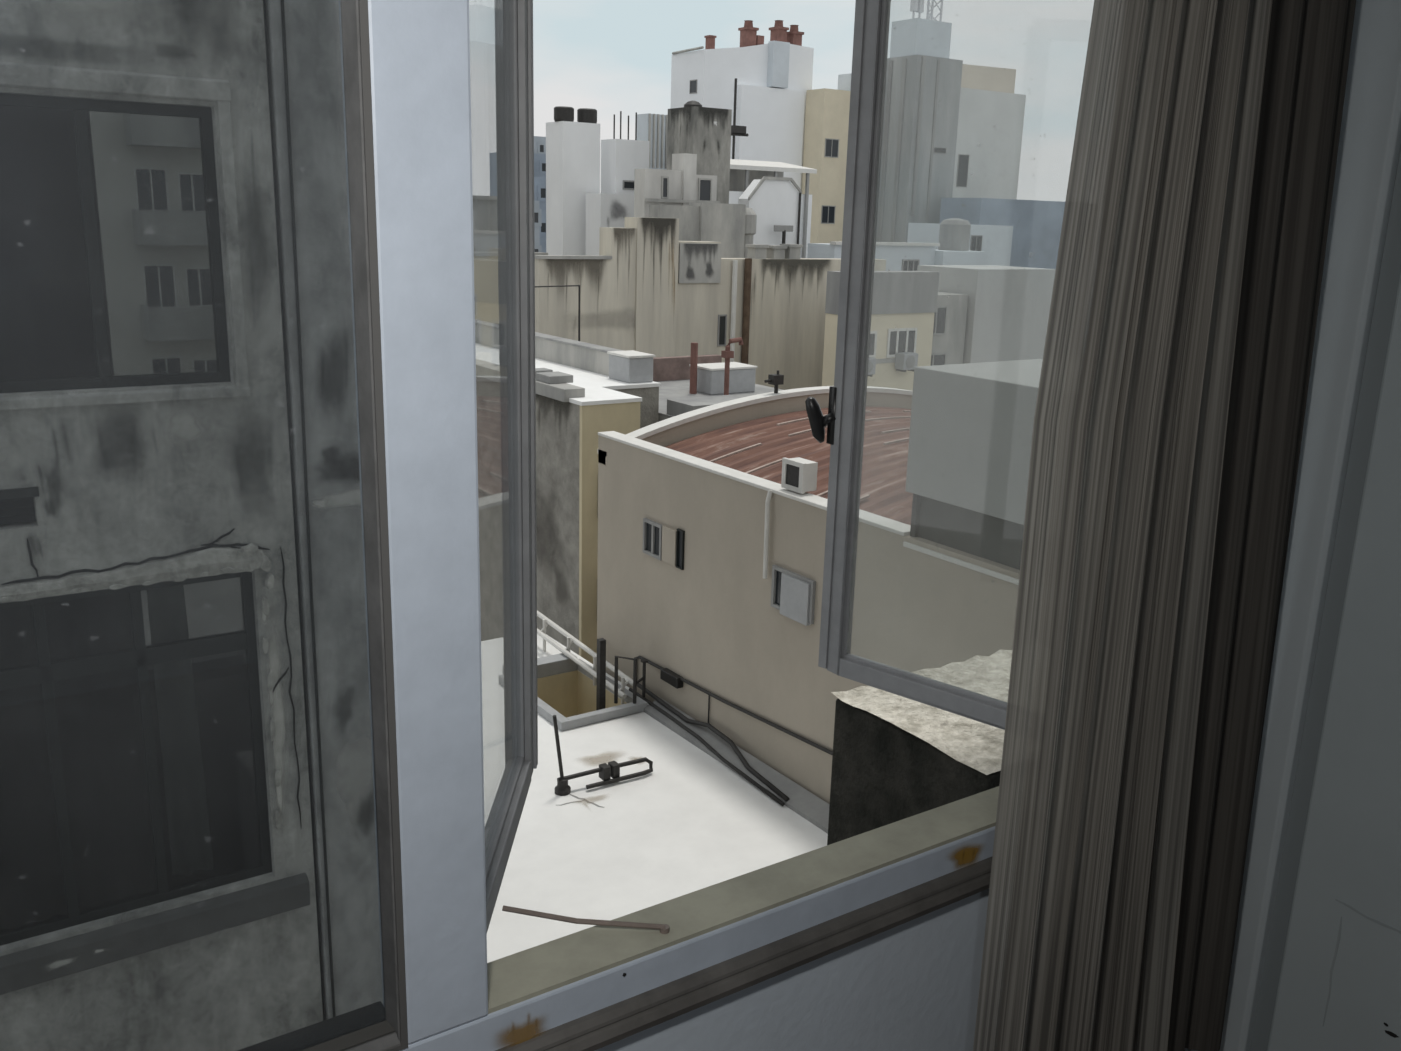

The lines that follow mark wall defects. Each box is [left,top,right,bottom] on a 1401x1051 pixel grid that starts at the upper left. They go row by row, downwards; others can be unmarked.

leakage [614,204,717,278]
leakage [762,259,830,275]
crack [1,528,302,829]
corrosion [953,846,980,866]
corrosion [503,1020,540,1046]